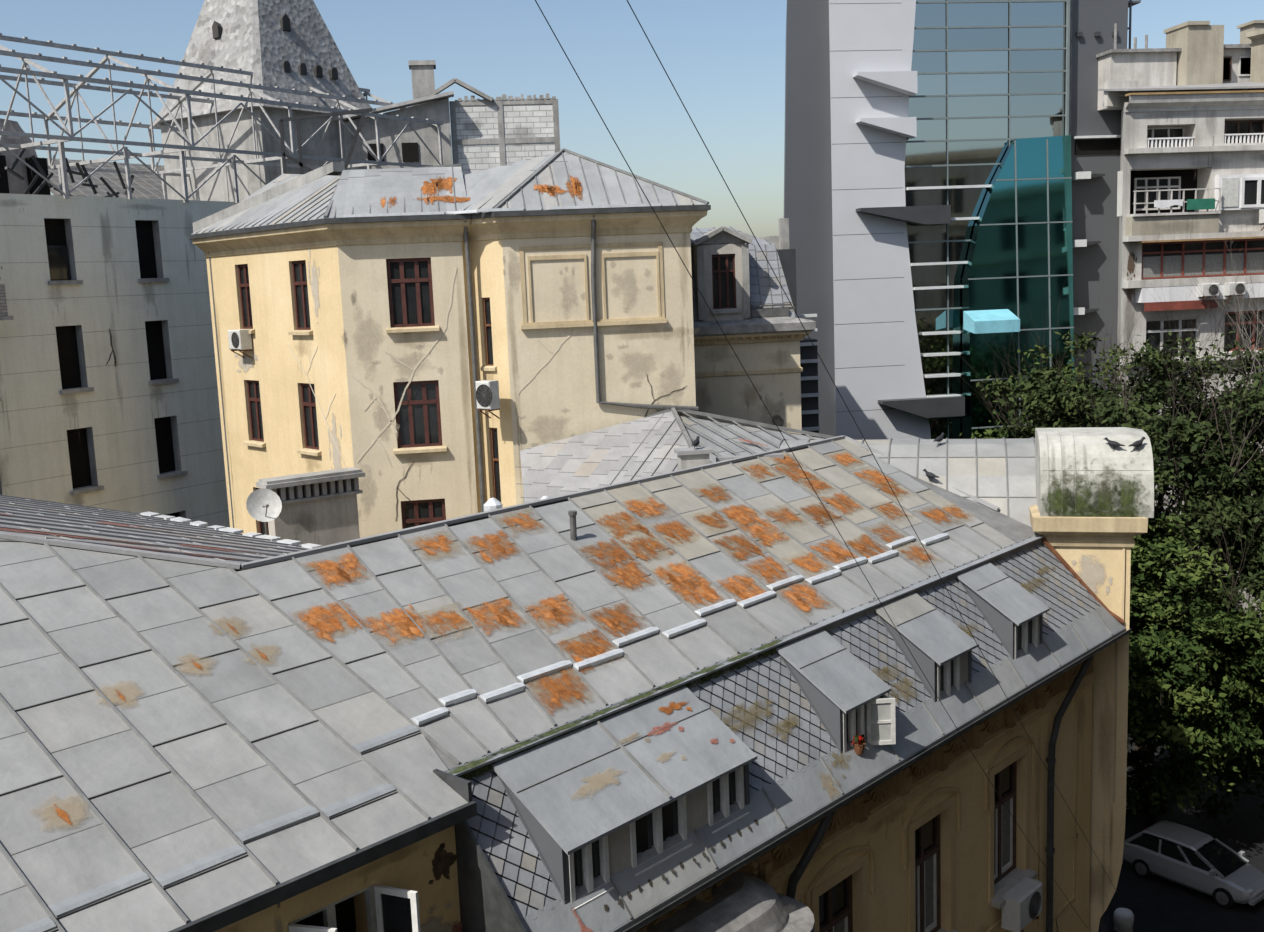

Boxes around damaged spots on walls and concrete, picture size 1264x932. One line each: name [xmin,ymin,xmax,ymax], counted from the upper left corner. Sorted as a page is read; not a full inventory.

rust [416,177,471,204]
rust [533,176,582,200]
rust [0,513,262,560]
rust [417,513,541,563]
rust [581,439,968,611]
rust [305,553,364,583]
rust [249,646,277,663]
rust [299,593,639,714]
rust [620,702,692,743]
rust [40,798,84,826]
peeling [429,843,458,885]
rust [572,908,593,932]